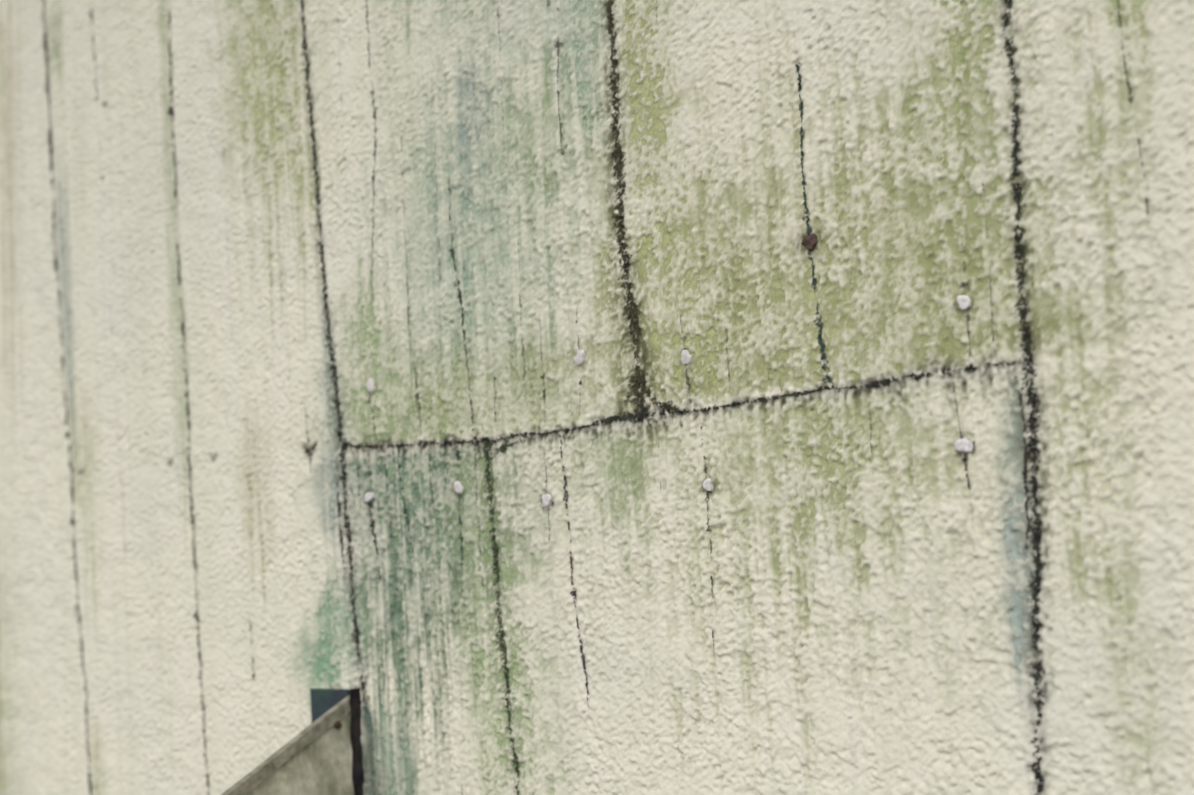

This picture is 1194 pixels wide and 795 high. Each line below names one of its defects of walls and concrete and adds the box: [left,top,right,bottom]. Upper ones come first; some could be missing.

crack [41,0,92,795]
crack [168,11,209,795]
water stain [363,703,407,795]
crack [301,0,1045,795]
corrosion [801,234,820,252]
water stain [1004,384,1034,673]